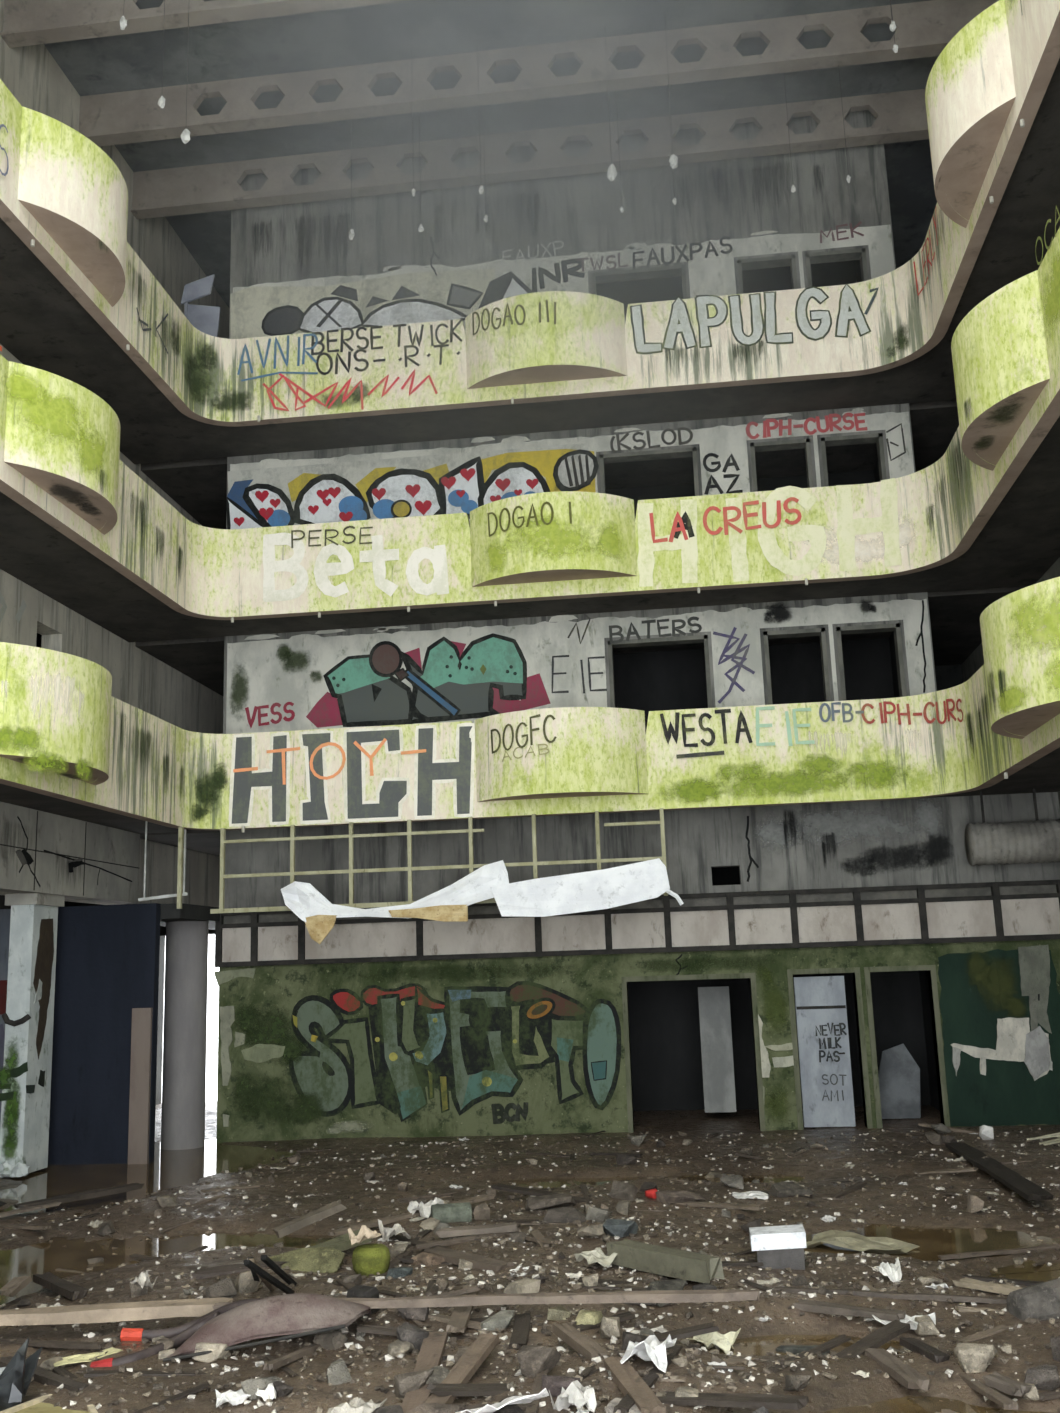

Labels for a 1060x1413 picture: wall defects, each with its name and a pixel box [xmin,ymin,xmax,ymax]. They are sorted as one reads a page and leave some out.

leakage [889,327,909,356]
leakage [784,811,803,845]
leakage [822,833,950,875]
peeling [951,945,1053,1081]